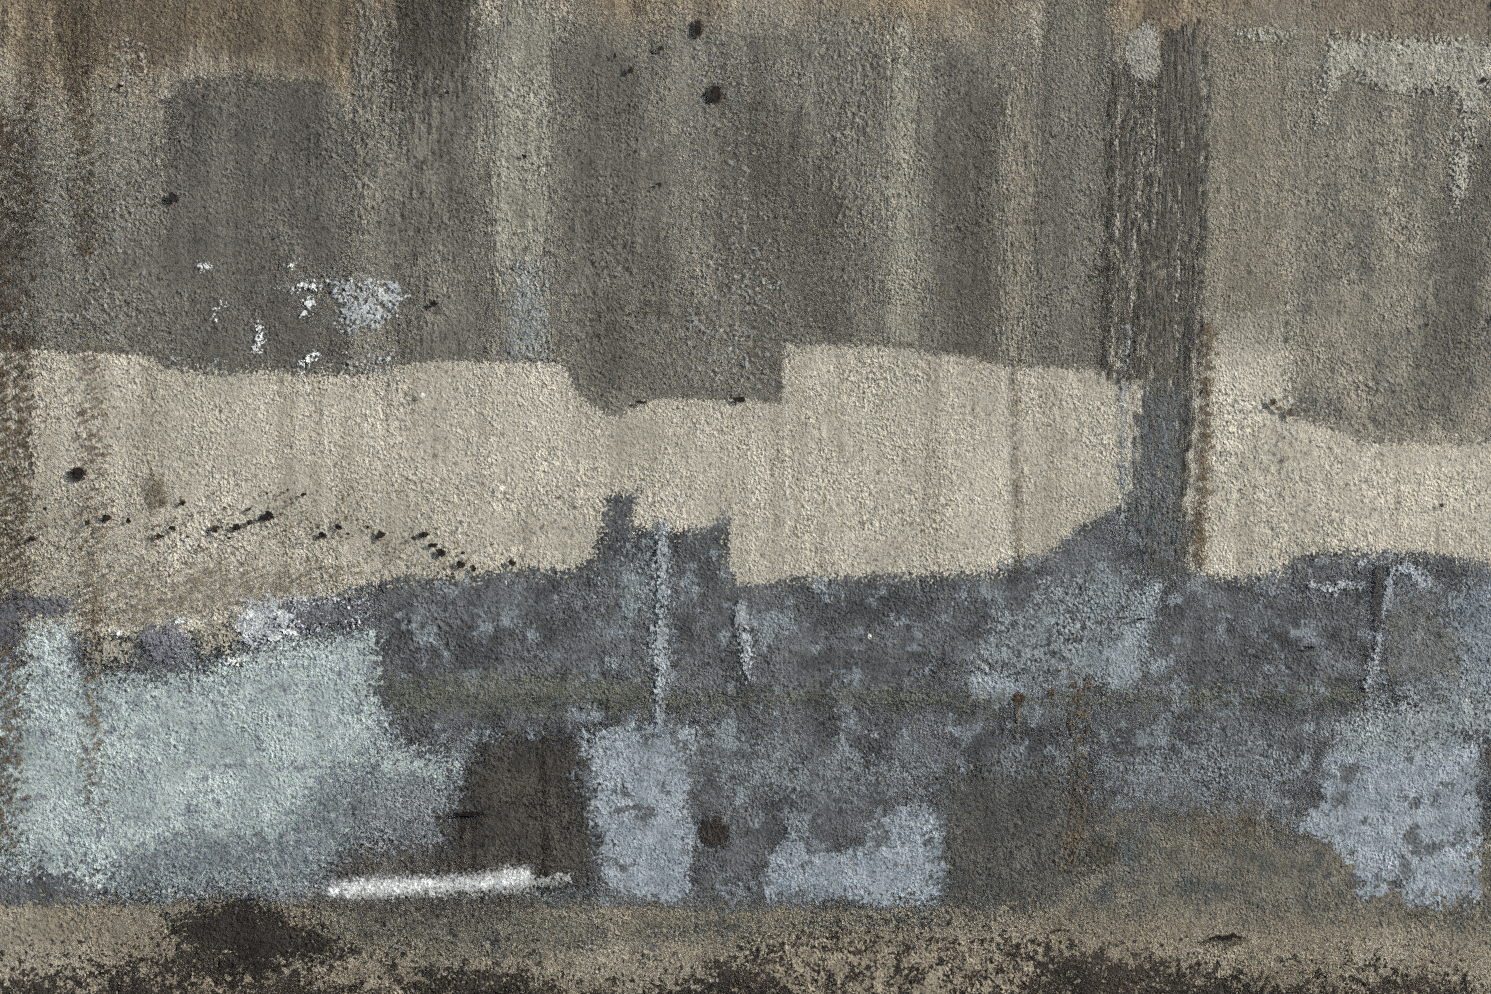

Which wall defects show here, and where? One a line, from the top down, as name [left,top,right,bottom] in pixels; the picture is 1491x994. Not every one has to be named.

rust [0,5,529,863]
rust [1188,318,1222,572]
damp [156,719,1491,986]